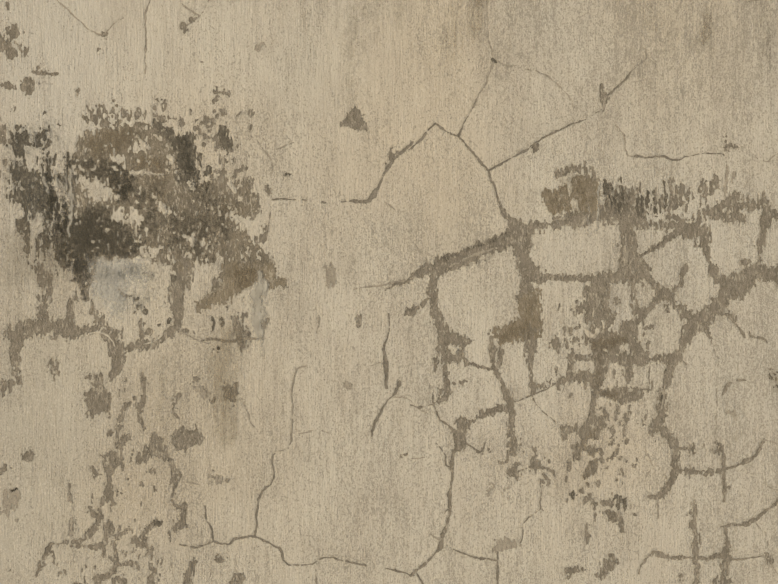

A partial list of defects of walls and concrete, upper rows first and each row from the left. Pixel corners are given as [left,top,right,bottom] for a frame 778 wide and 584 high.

peeling [0,22,29,60]
peeling [0,66,59,96]
crack [180,0,209,34]
crack [248,0,778,232]
damp [588,164,738,233]
crack [0,378,15,398]
peeling [0,86,289,584]
crack [179,365,366,584]
crack [364,313,428,437]
crack [386,416,522,584]
crack [677,379,778,503]
crack [720,486,778,546]